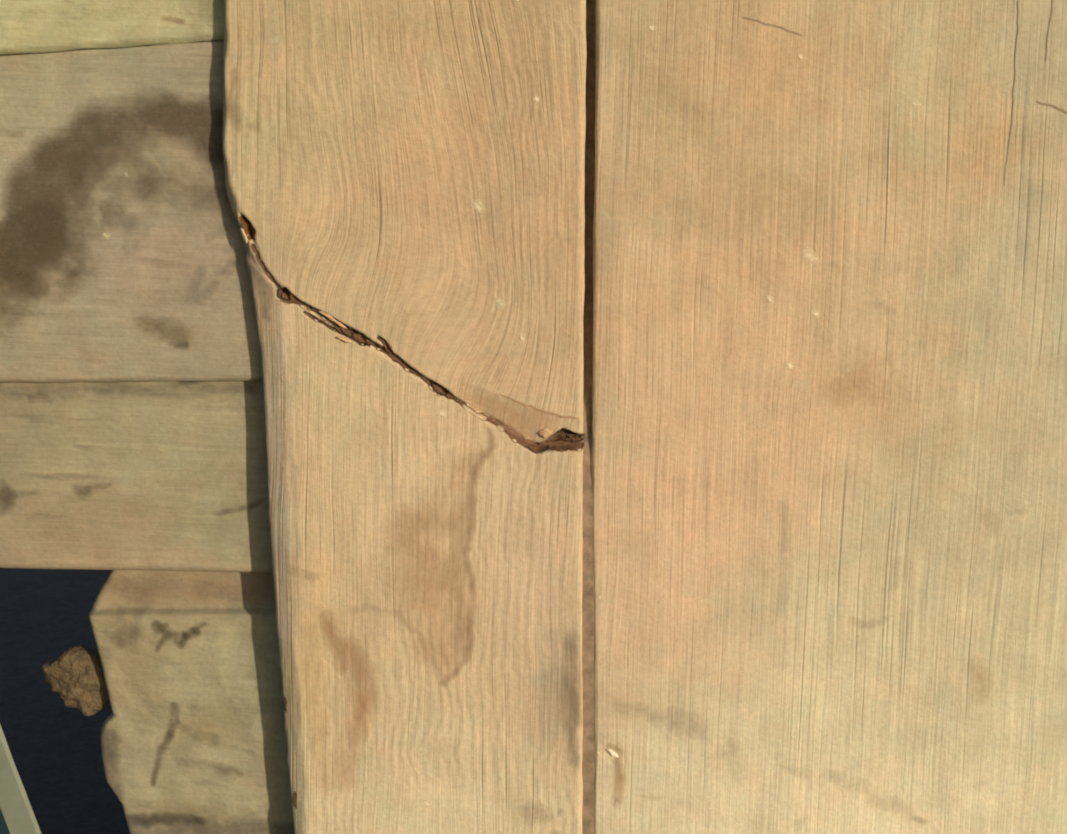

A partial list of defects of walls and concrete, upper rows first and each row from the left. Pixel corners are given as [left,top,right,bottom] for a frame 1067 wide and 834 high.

damp [0,99,224,292]
crack [252,244,584,454]